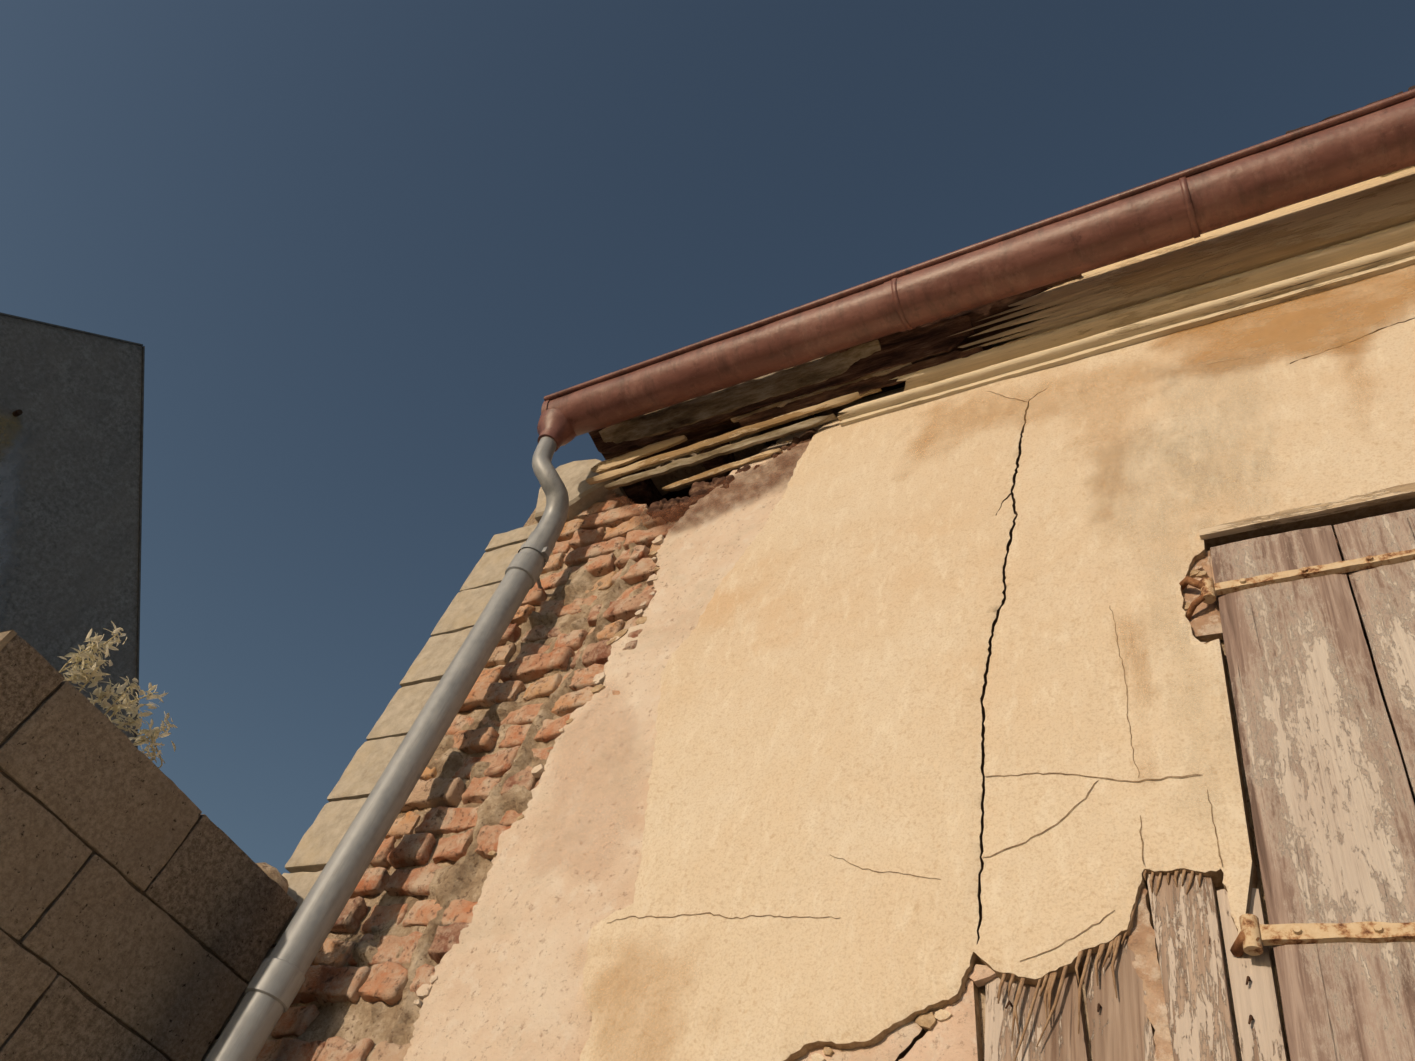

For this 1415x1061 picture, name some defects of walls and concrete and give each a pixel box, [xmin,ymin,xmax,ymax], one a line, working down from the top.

water stain [1174,278,1415,371]
crack [1290,318,1414,364]
crack [977,389,1223,944]
peeling [255,405,844,1061]
crack [831,855,941,880]
crack [608,912,837,923]
crack [1020,910,1115,961]
crack [895,987,967,1061]